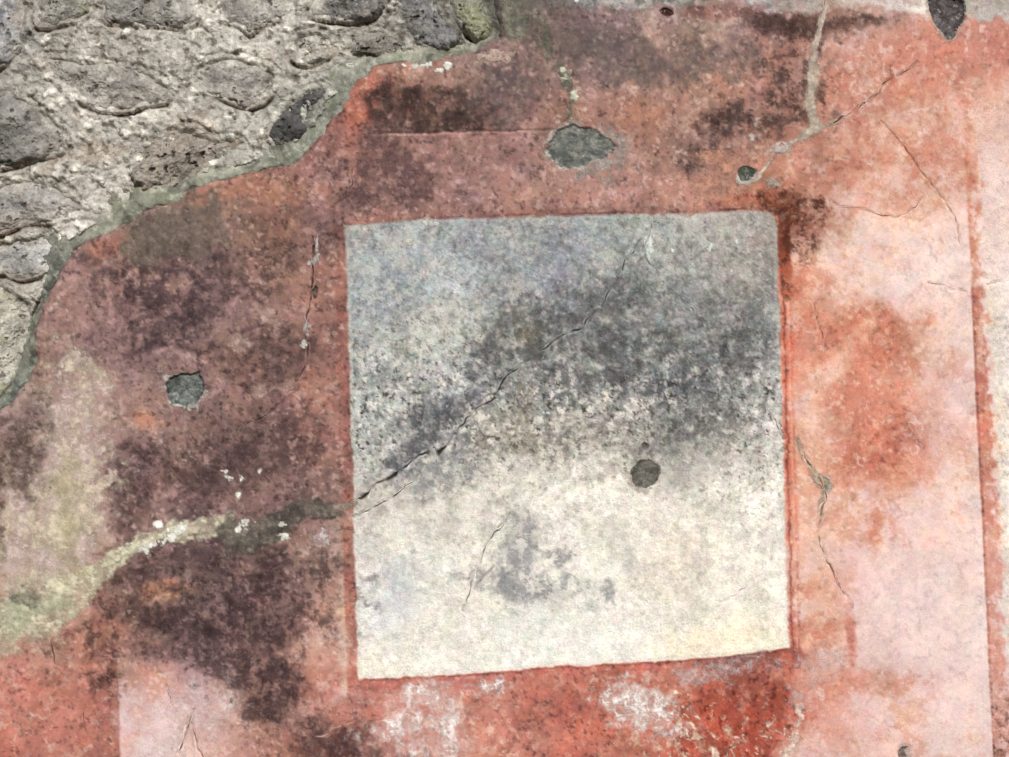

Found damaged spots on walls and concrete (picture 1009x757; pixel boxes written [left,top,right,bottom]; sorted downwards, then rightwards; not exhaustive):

spalling [0,0,500,410]
crack [230,160,357,453]
flaking render [543,120,636,183]
crack [736,0,962,246]
crack [0,215,702,664]
crack [765,405,854,608]
water stain [86,625,116,657]
water stain [138,538,340,729]